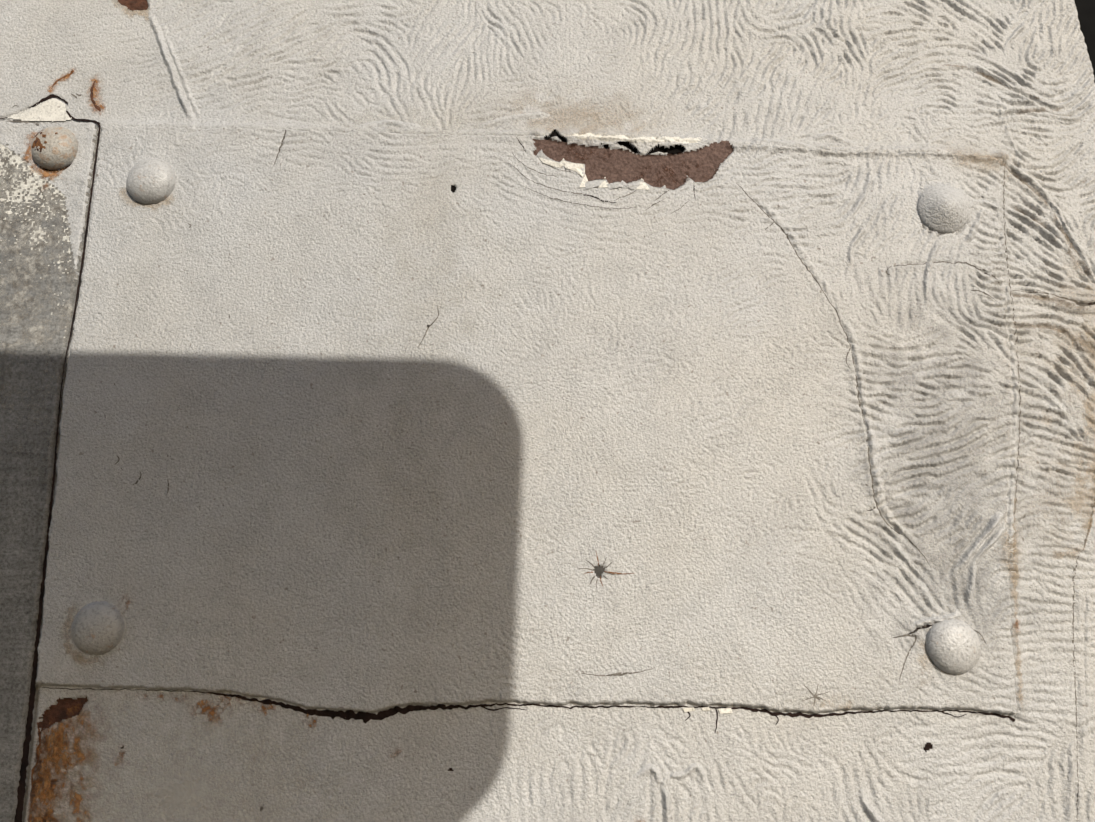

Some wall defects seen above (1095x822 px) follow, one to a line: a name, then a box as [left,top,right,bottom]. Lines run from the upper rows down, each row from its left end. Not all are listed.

spalling [118,0,149,11]
rust [90,79,104,111]
rust [24,133,57,186]
peeling [509,129,734,213]
peeling [0,94,100,353]
crack [14,126,1015,822]
rust [29,714,91,822]